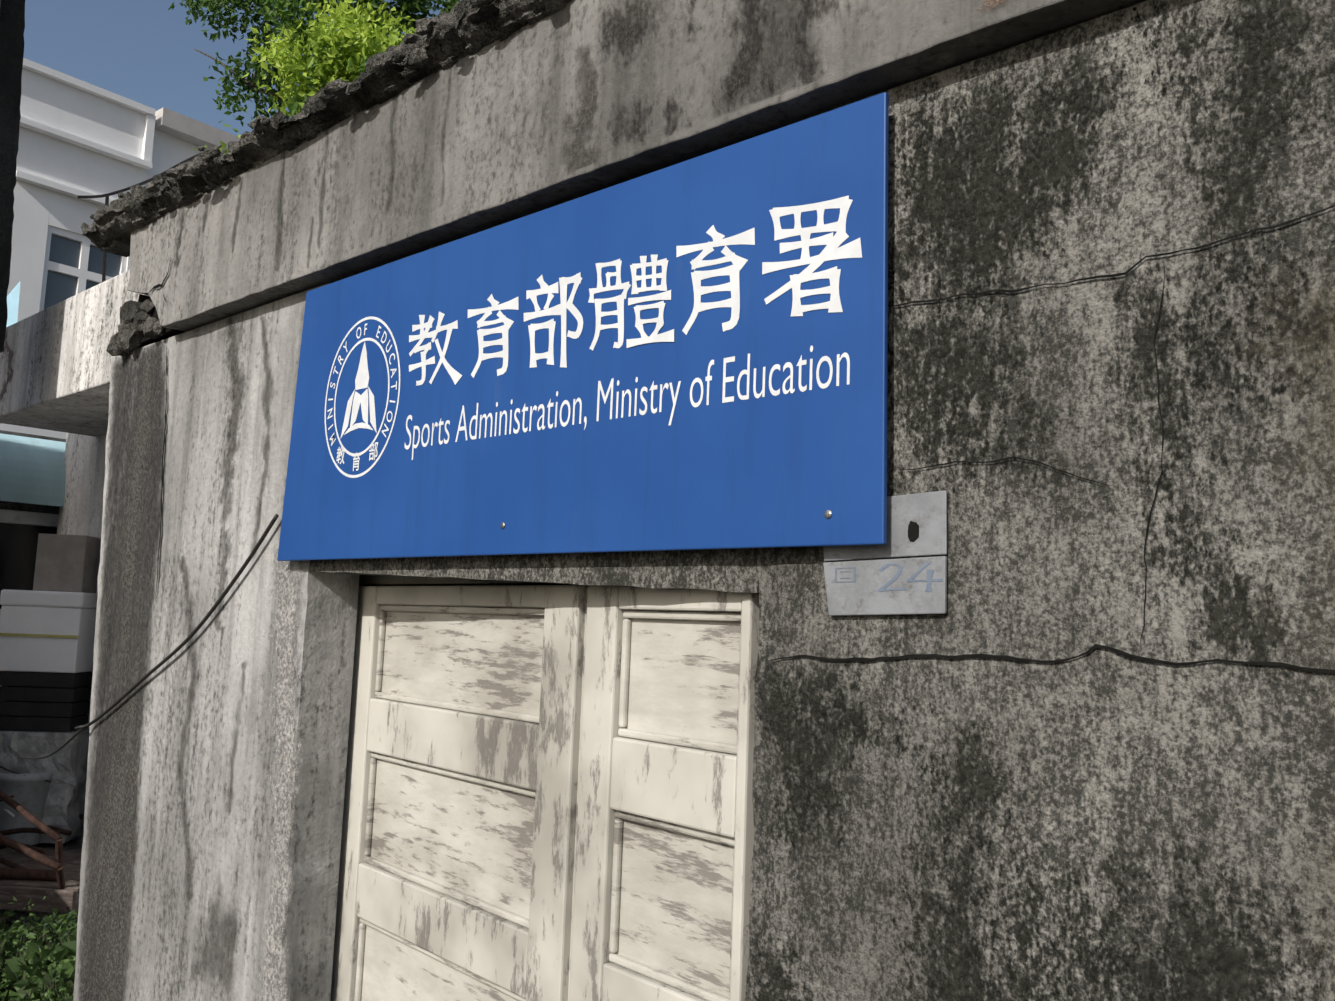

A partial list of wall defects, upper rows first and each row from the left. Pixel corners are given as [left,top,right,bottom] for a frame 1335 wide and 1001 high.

spalling [81,0,572,257]
water stain [564,0,655,169]
water stain [607,97,690,145]
water stain [718,0,838,111]
spalling [106,294,184,356]
crack [768,205,1335,673]
water stain [887,0,1335,679]
water stain [745,661,1335,1001]